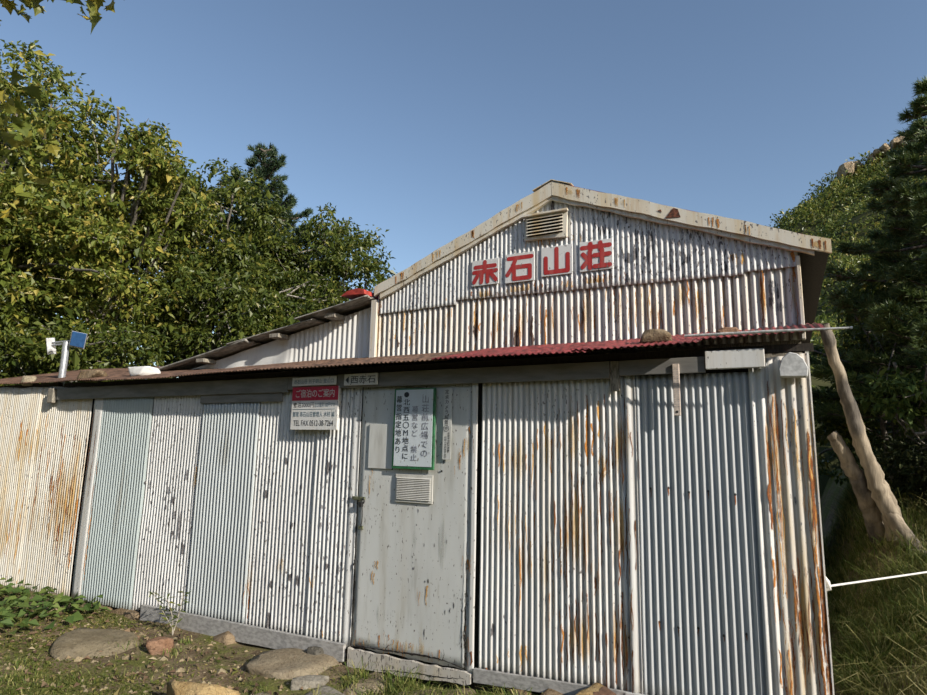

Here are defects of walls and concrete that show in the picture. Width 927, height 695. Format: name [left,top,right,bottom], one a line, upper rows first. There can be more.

peeling [570,209,734,284]
corrosion [378,294,428,346]
corrosion [462,272,663,350]
corrosion [669,278,710,329]
corrosion [0,414,98,587]
corrosion [493,394,639,693]
corrosion [766,381,833,695]